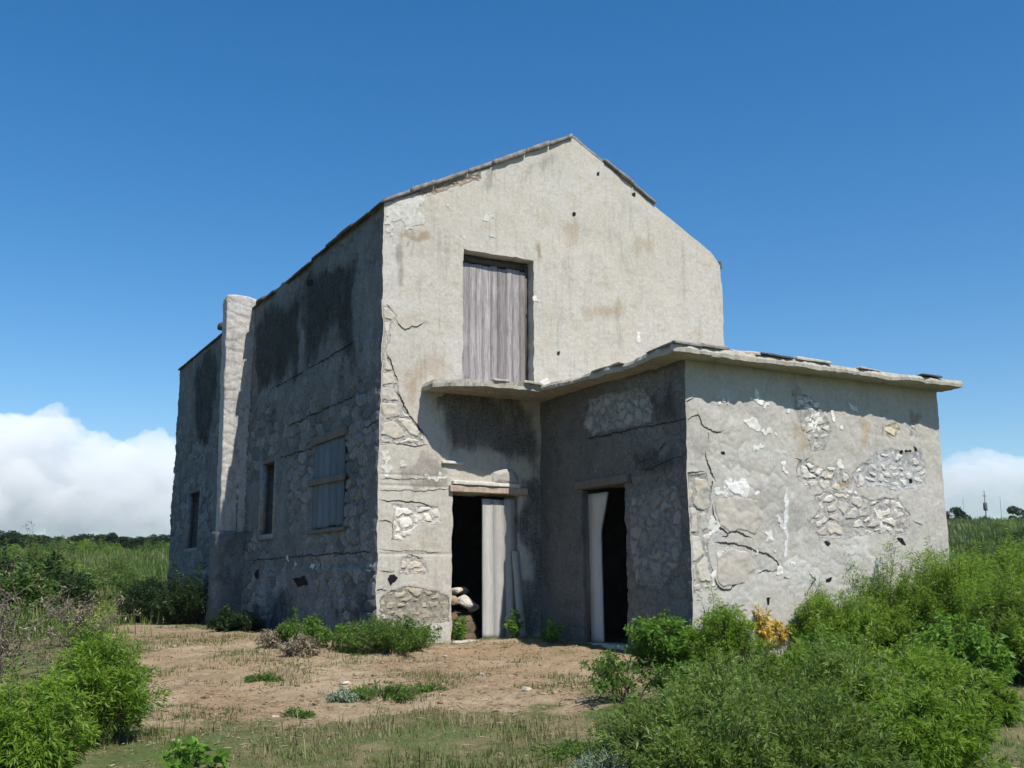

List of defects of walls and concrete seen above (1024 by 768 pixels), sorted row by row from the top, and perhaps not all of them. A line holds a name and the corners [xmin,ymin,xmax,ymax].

flaking render [385,172,481,236]
leakage [256,265,355,390]
crack [363,304,428,447]
spalling [379,556,450,623]
spalling [392,503,441,541]
leakage [437,393,537,460]
leakage [516,479,542,636]
spalling [583,388,653,436]
spalling [629,473,760,594]
crack [587,396,816,597]
spalling [743,388,926,539]